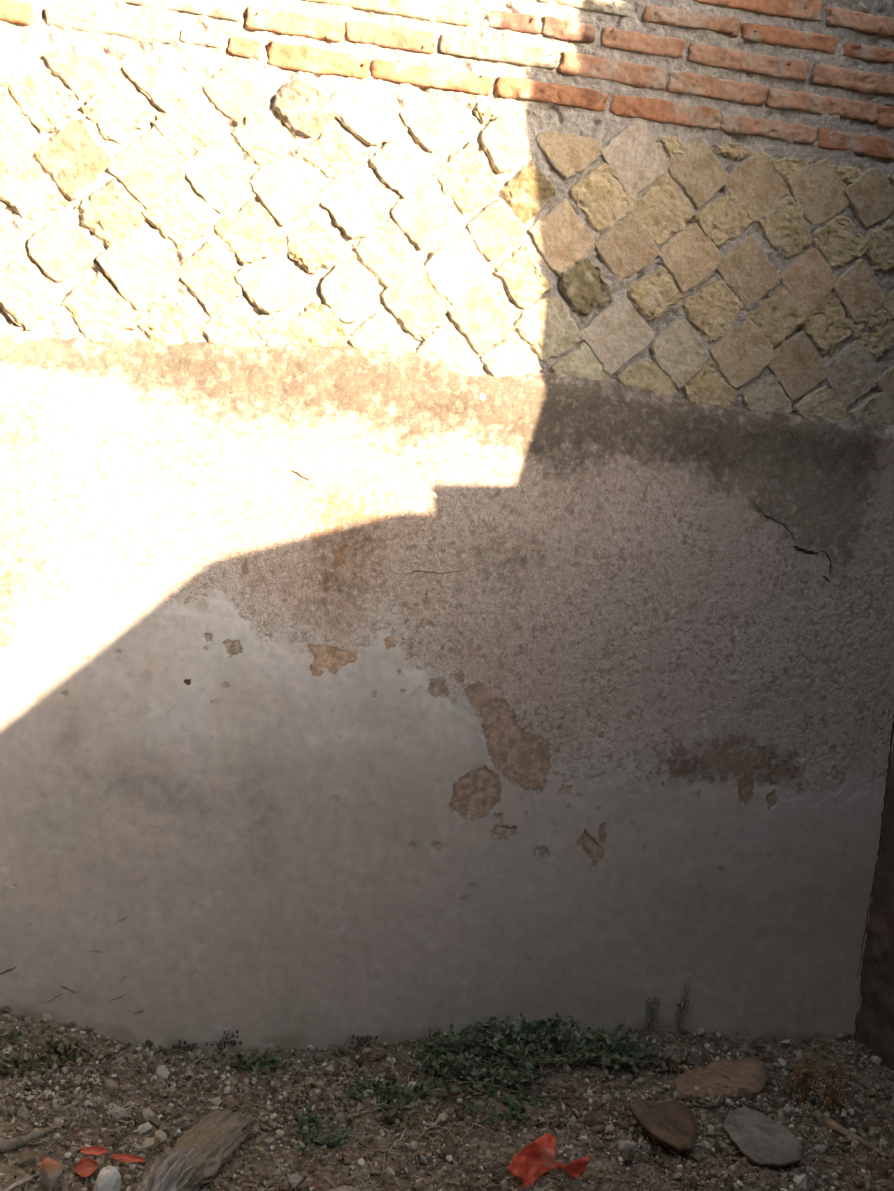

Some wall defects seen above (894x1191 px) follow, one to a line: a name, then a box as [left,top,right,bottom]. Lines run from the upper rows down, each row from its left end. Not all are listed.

water stain [0,337,883,562]
crack [751,498,832,582]
crack [408,568,463,576]
spalling [202,633,243,657]
peeling [308,644,356,676]
peeling [428,670,551,840]
spalling [738,773,777,809]
spalling [577,806,606,866]